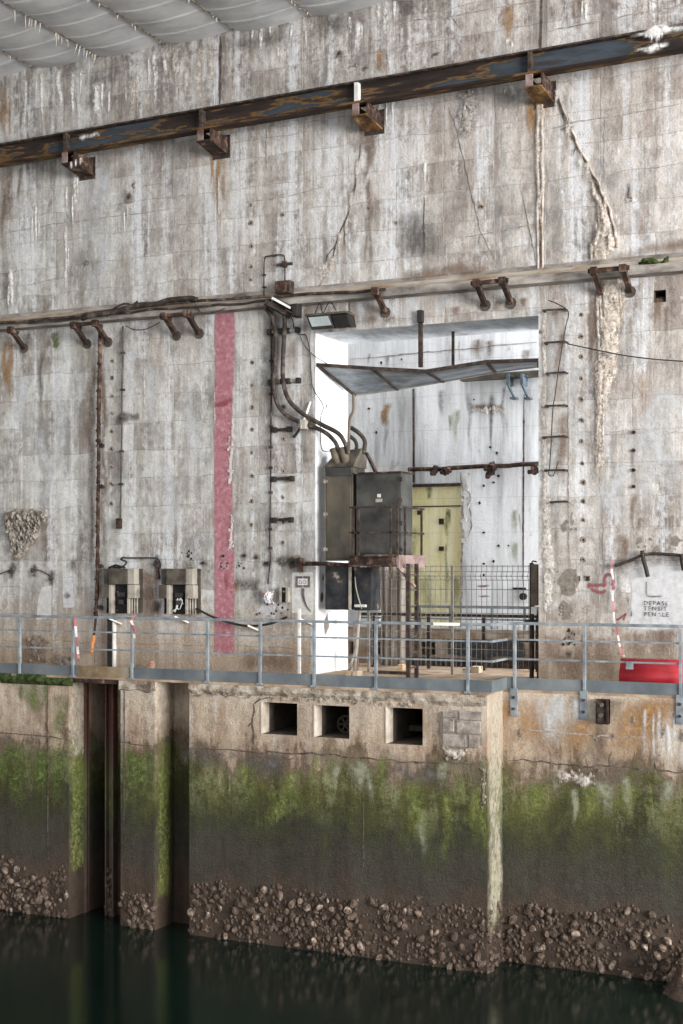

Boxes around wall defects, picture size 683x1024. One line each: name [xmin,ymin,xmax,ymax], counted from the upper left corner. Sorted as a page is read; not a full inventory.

crack [319,144,361,286]
rust [527,102,536,136]
crack [556,100,614,232]
leakage [354,763,372,789]
leakage [490,699,501,917]